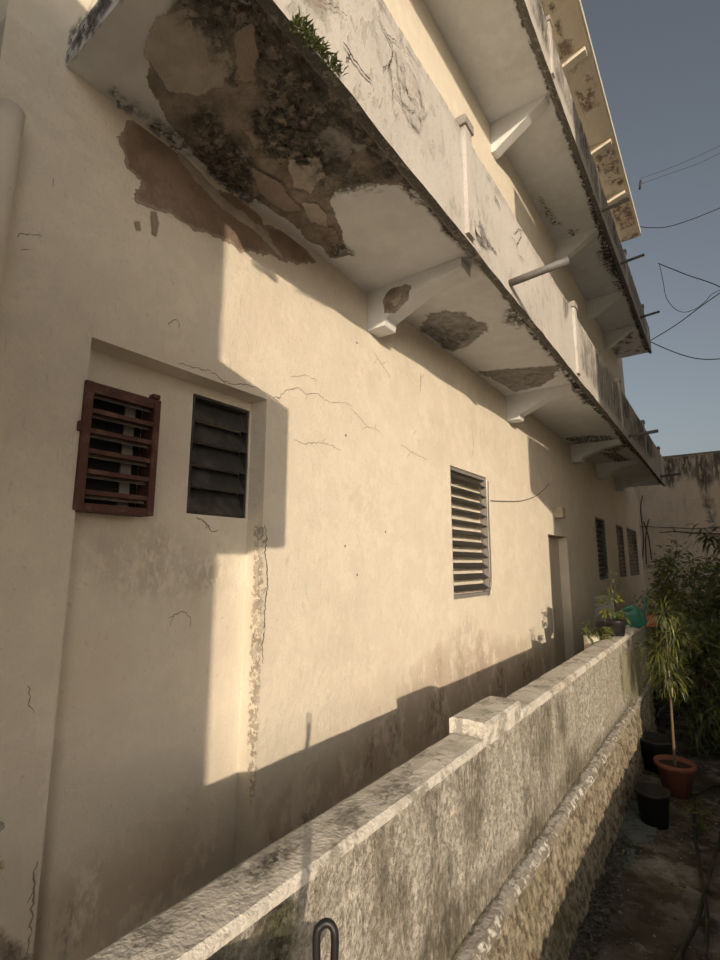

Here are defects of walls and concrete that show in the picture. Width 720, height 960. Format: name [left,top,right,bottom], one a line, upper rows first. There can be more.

water stain [149,109,265,203]
peeling [117,0,413,265]
water stain [176,0,472,259]
peeling [396,47,428,132]
peeling [383,284,411,314]
crack [179,363,377,430]
water stain [652,454,720,484]
flaking render [0,935,29,960]